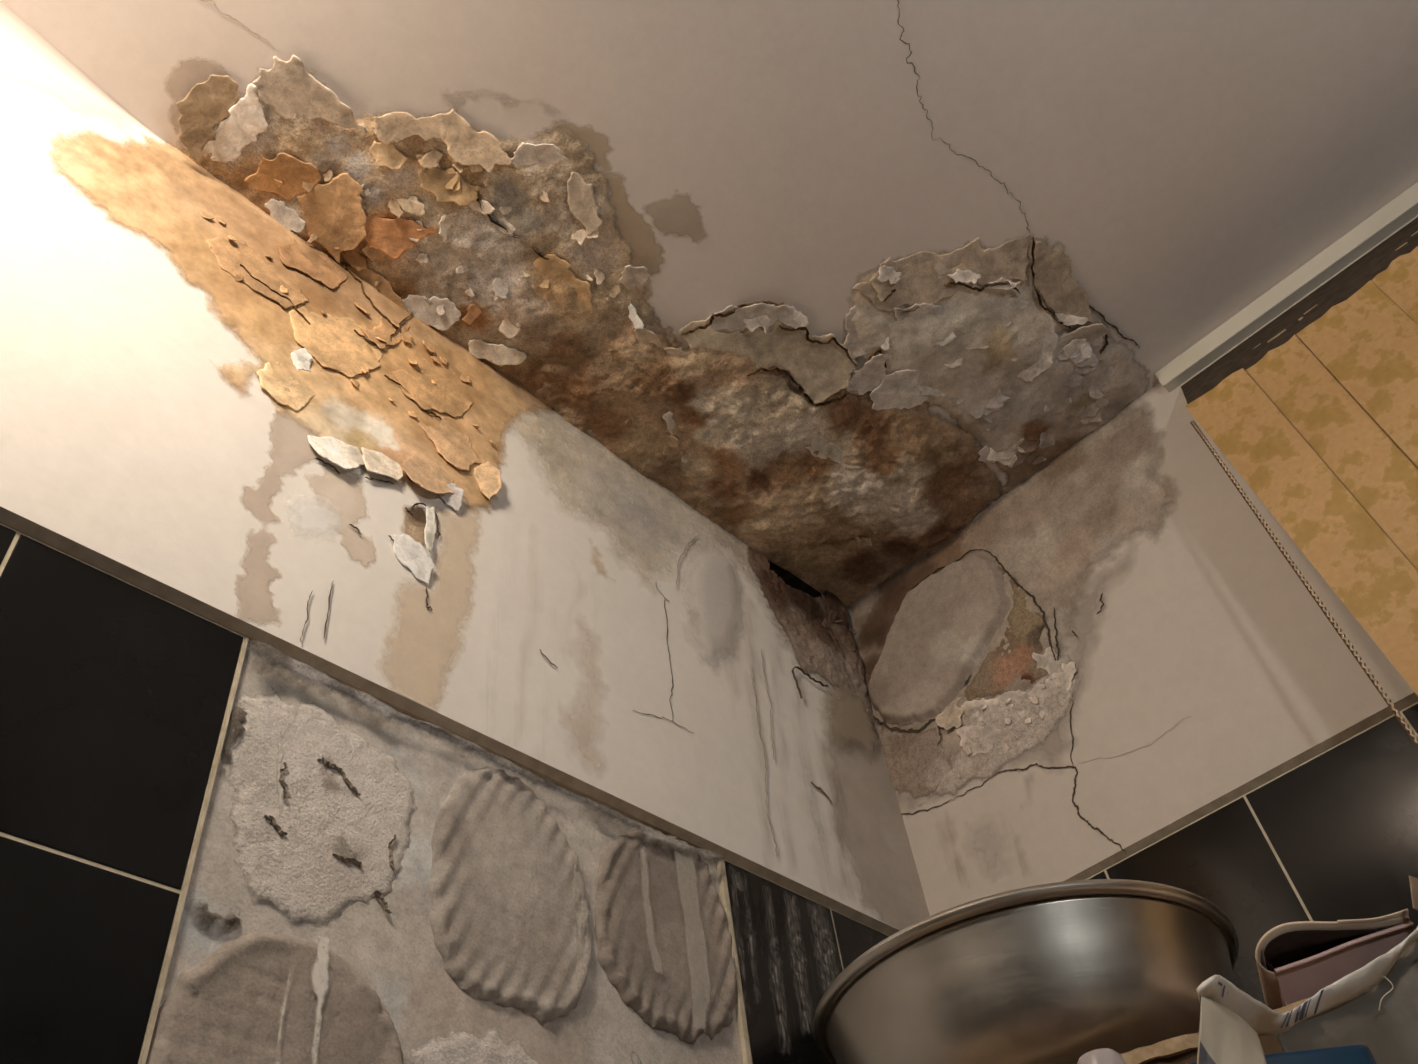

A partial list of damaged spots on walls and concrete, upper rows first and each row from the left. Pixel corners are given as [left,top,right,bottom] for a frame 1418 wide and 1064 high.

damp [175,60,228,82]
crack [897,0,1031,233]
damp [50,106,787,709]
peeling [176,55,1149,610]
flaking render [227,694,416,925]
spalling [255,642,553,787]
spalling [571,792,724,861]
crack [633,535,698,733]
crack [874,711,943,746]
crack [897,549,1105,661]
peeling [935,647,1077,757]
crack [901,694,1192,852]